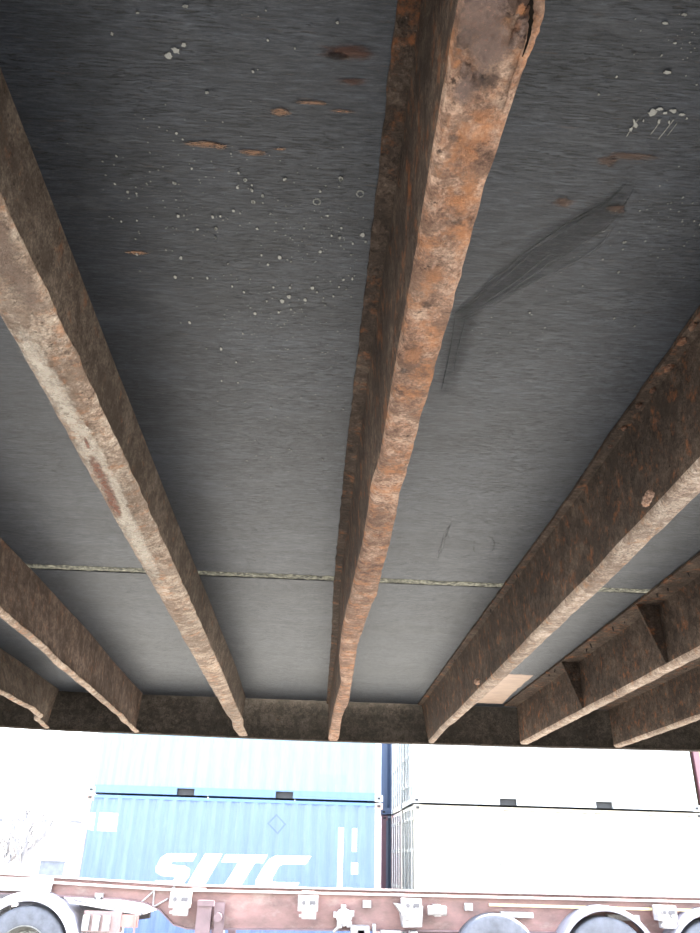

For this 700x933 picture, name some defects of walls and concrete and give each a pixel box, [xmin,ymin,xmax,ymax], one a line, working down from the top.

crack [522,0,534,57]
rust [481,75,499,90]
rust [0,223,40,311]
rust [641,490,655,507]